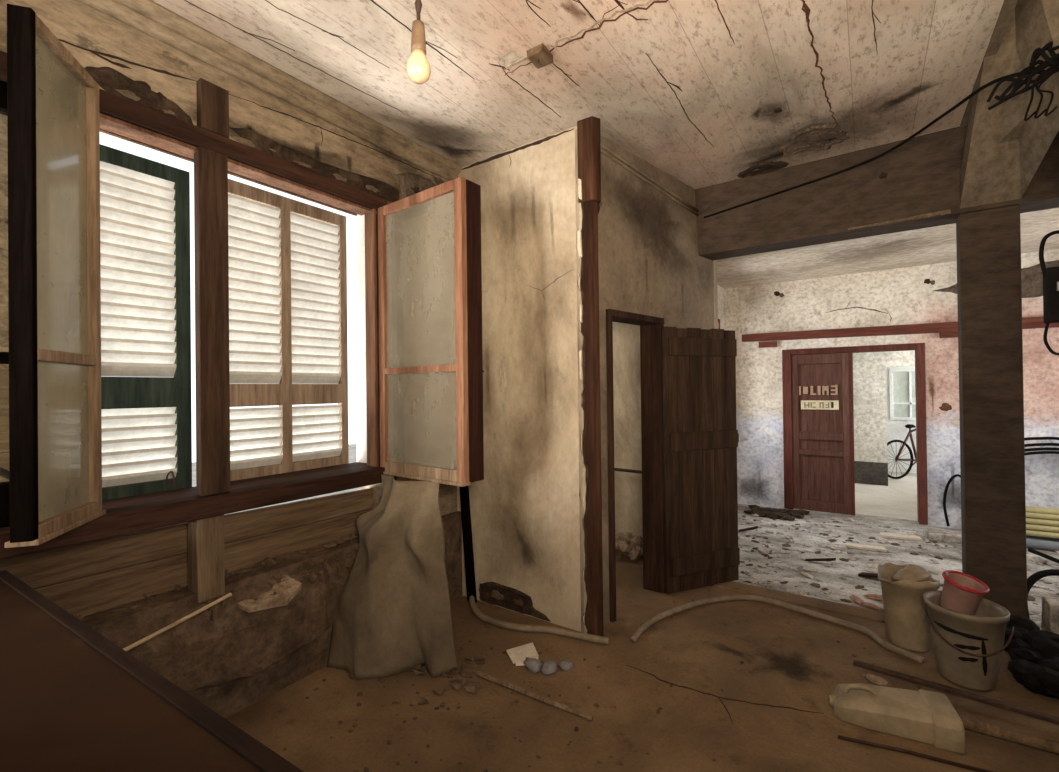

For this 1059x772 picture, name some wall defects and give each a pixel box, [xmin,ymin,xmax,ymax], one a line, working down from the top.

crack [715,0,735,45]
crack [871,0,881,51]
spalling [84,66,193,124]
crack [229,0,668,181]
crack [645,53,714,147]
crack [801,0,837,123]
water stain [891,87,928,104]
crack [626,665,824,723]